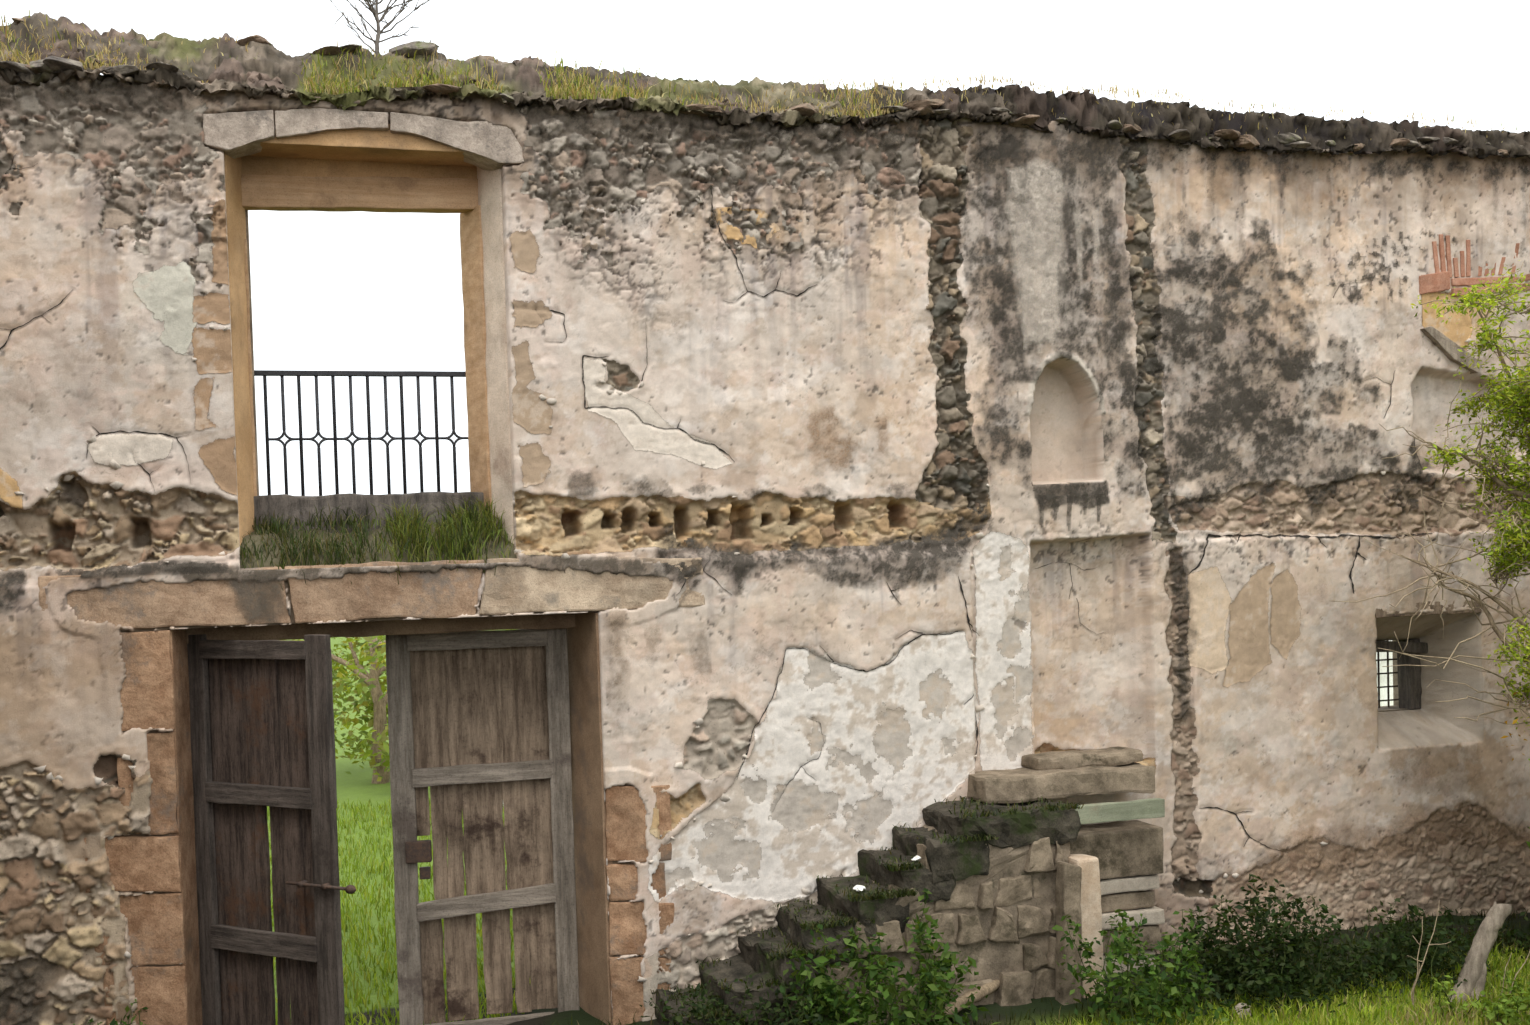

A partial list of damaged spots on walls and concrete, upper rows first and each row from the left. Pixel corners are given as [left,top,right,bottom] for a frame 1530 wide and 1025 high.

crack [0,296,67,349]
flaking render [0,73,239,571]
crack [534,309,734,461]
flaking render [509,103,1080,1022]
crack [738,577,979,775]
leakage [958,126,1467,530]
flaking render [1118,133,1530,947]
flaking render [0,754,153,1025]